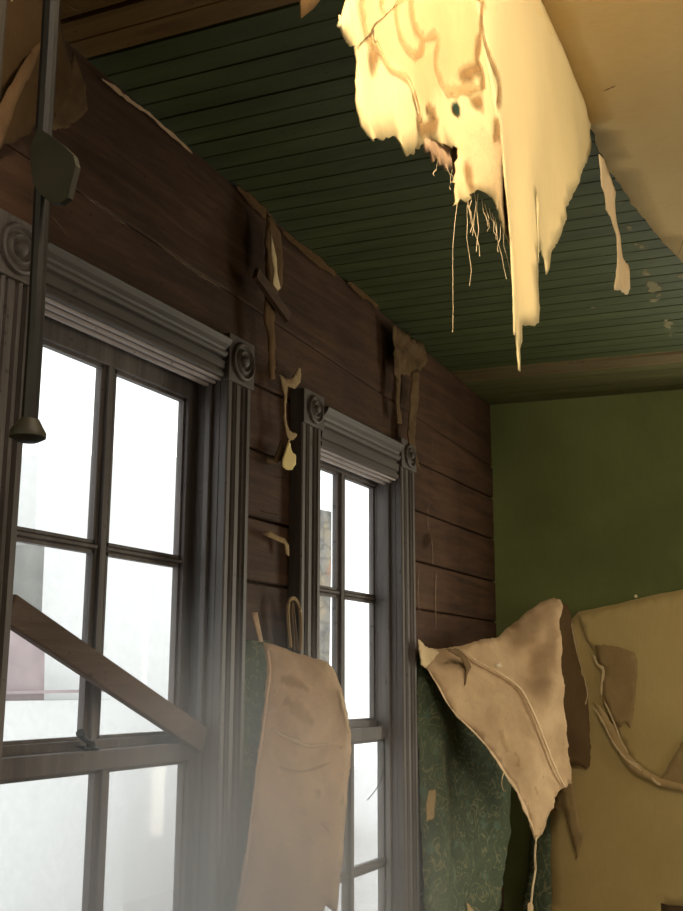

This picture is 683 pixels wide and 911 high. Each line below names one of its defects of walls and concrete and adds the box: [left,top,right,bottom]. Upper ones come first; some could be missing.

leakage [363,0,439,136]
leakage [381,0,502,108]
peeling [235,642,352,911]
peeling [418,597,683,911]